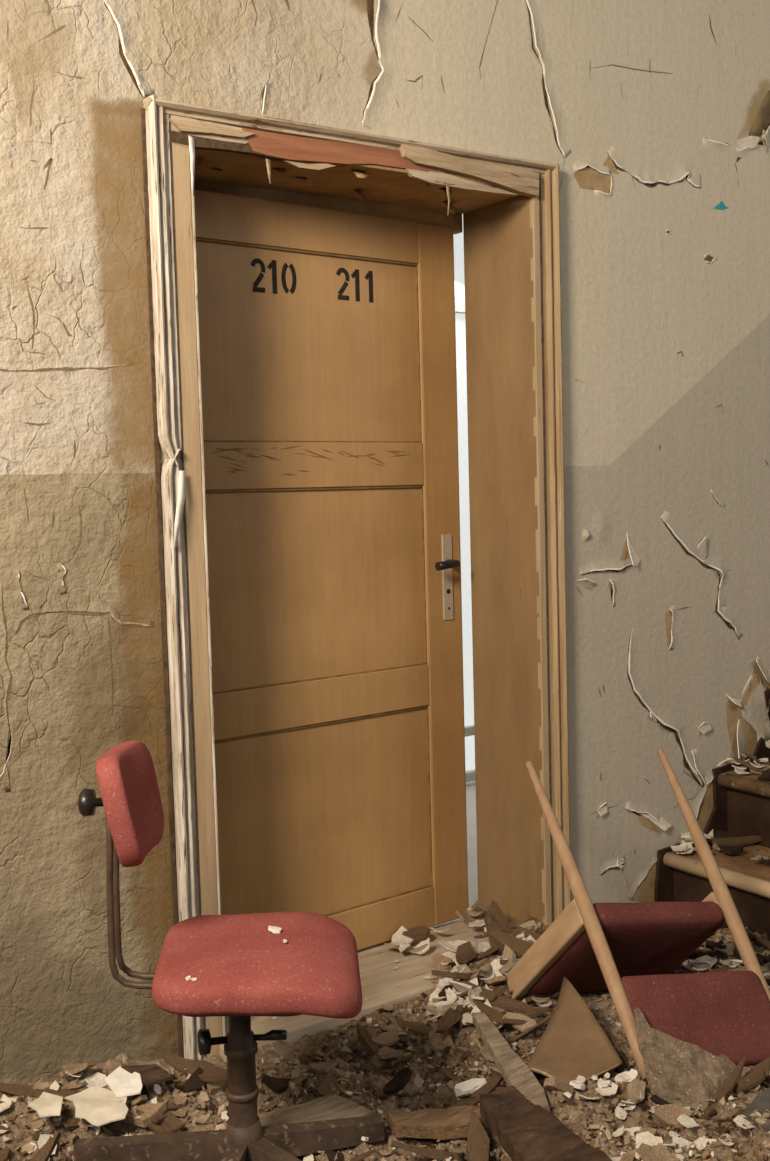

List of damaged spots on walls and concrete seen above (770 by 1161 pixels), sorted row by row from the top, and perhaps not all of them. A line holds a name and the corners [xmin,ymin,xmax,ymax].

crack [103,0,156,98]
crack [356,0,445,129]
flaking render [573,156,618,199]
crack [526,0,701,189]
flaking render [703,85,770,173]
peeling [576,533,641,607]
crack [661,511,743,639]
crack [627,628,716,808]
peeling [592,656,770,854]
flaking render [598,846,657,902]